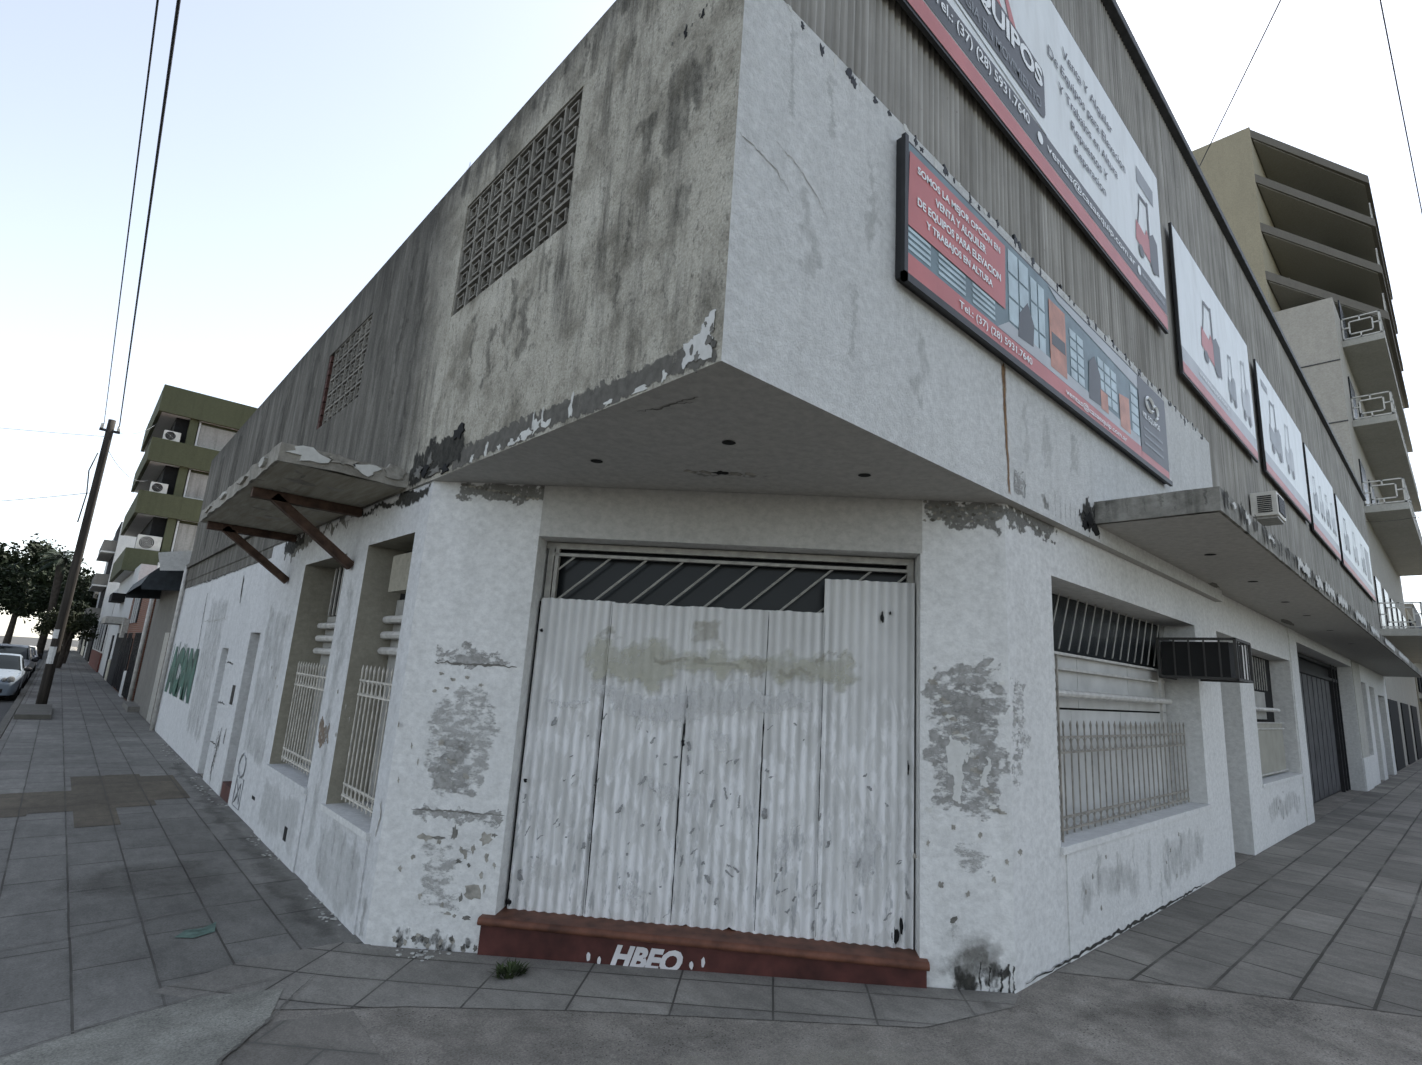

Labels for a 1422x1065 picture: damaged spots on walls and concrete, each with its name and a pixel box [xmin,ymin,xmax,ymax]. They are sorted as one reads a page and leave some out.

peeling [682,309,717,369]
leakage [452,338,717,505]
peeling [398,641,515,920]
peeling [921,658,1031,839]
peeling [517,819,591,881]
peeling [680,828,739,905]
peeling [774,867,821,932]
peeling [392,933,478,952]
crack [0,969,320,1065]